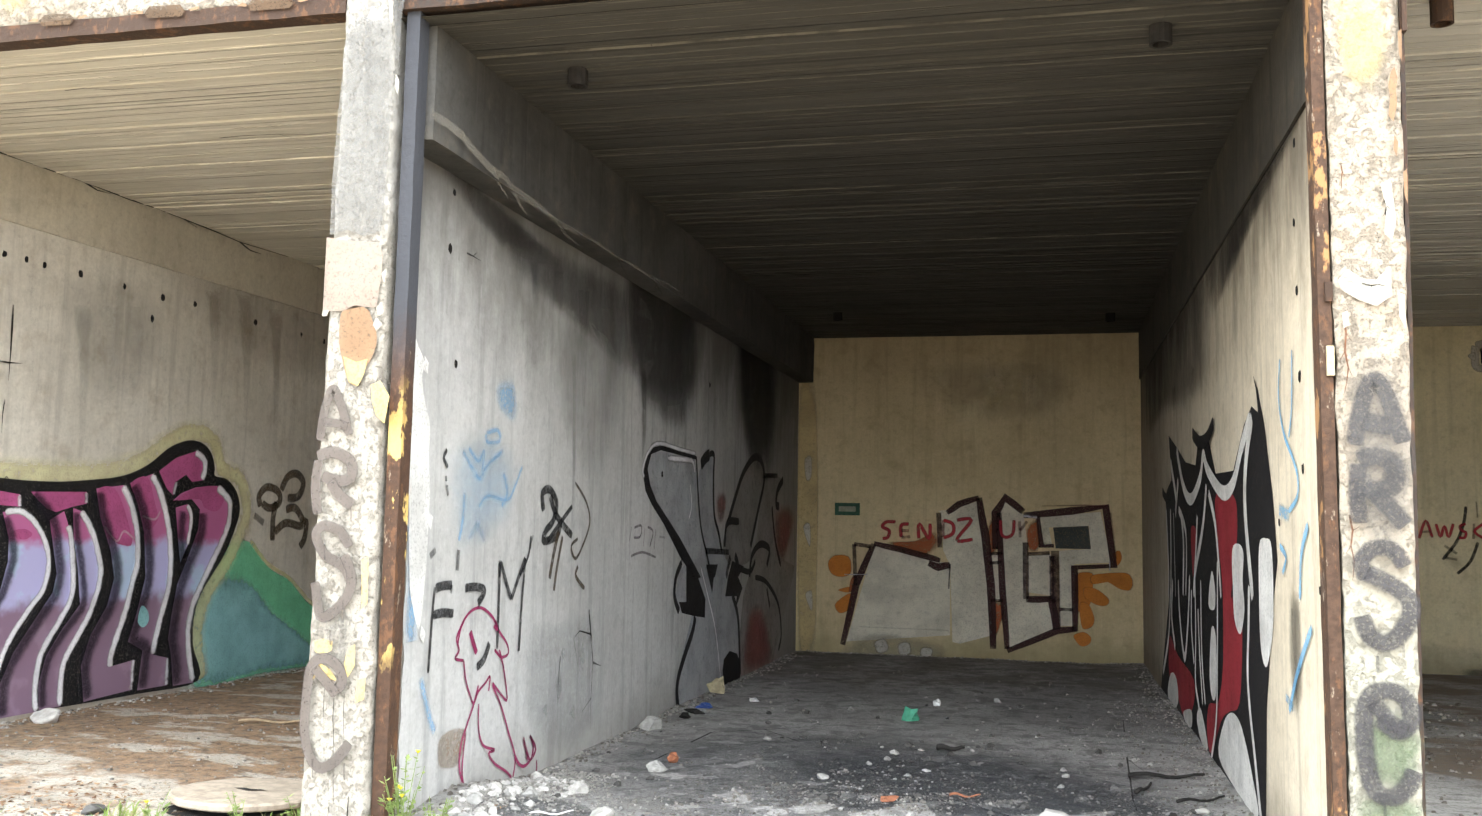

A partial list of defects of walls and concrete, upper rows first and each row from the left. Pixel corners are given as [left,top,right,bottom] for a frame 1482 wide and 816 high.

peeling [322,237,389,423]
peeling [409,340,433,643]
peeling [313,639,365,703]